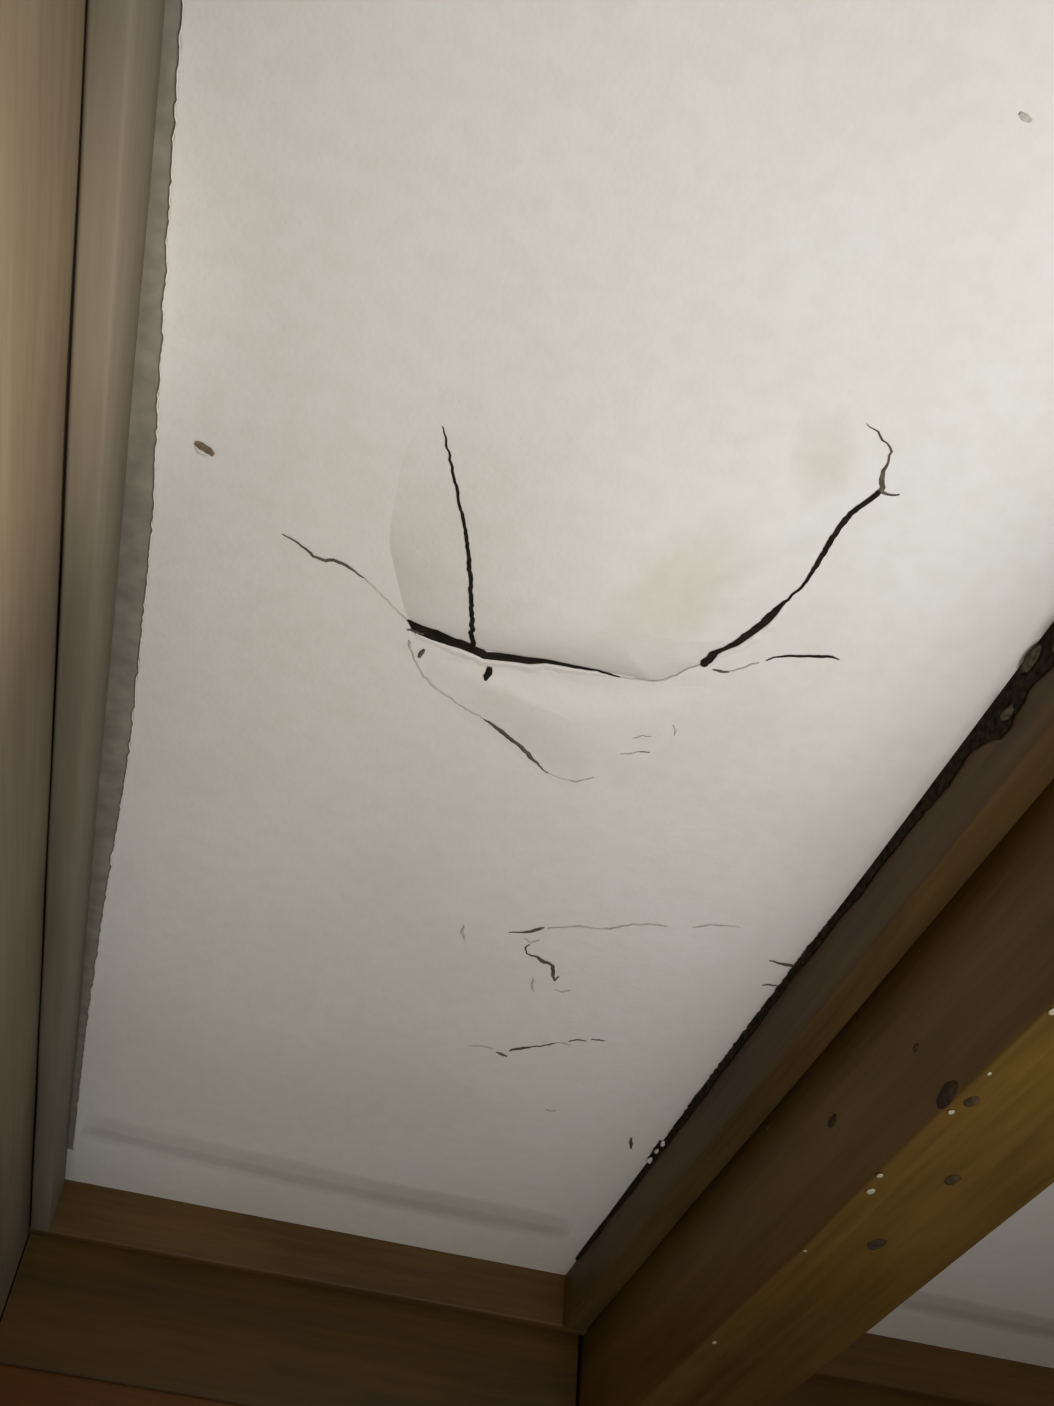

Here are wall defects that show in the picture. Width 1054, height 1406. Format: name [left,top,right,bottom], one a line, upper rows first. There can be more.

crack [282,424,900,783]
crack [509,924,740,993]
crack [472,1039,603,1057]